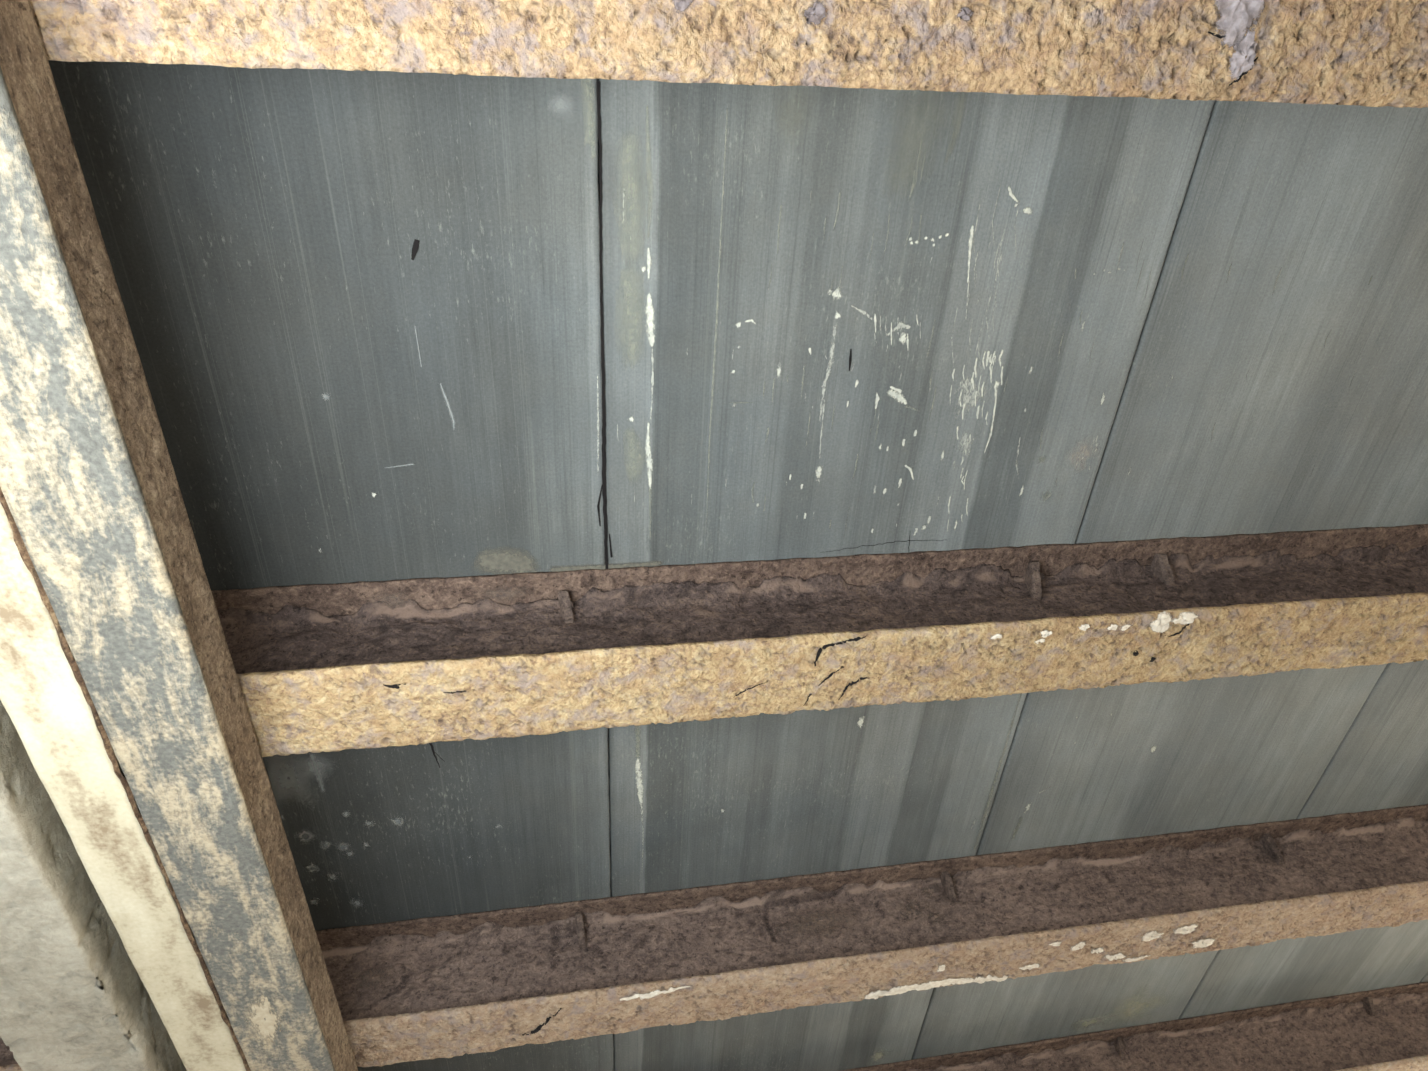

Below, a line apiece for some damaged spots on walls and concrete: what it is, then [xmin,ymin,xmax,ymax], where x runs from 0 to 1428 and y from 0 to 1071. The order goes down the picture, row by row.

rust [673,0,693,13]
rust [804,1,827,25]
rust [1213,0,1265,79]
peeling [820,287,921,419]
peeling [947,350,1003,531]
crack [803,635,867,706]
rust [1049,924,1215,962]